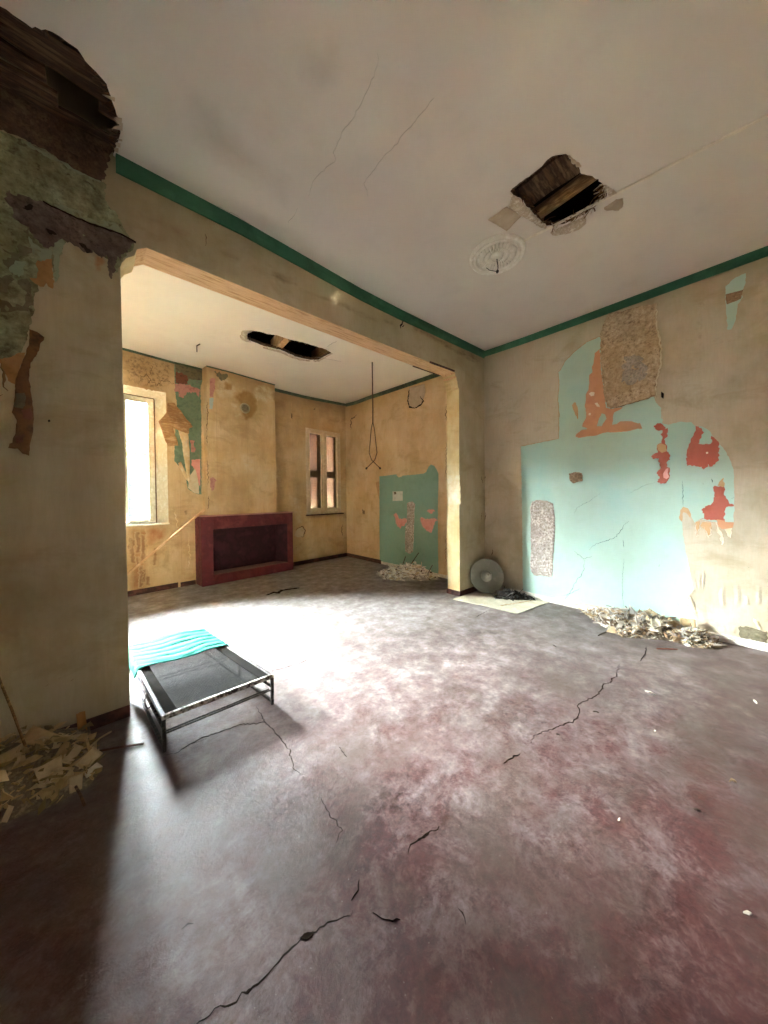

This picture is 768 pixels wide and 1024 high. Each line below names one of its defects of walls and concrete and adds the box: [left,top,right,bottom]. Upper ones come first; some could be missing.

peeling [0,87,136,384]
peeling [174,364,228,494]
peeling [376,465,439,573]
peeling [521,303,735,624]
flaking render [738,619,768,643]
crack [168,708,303,775]
crack [504,648,647,763]
crack [408,827,439,852]
crack [197,881,400,1024]